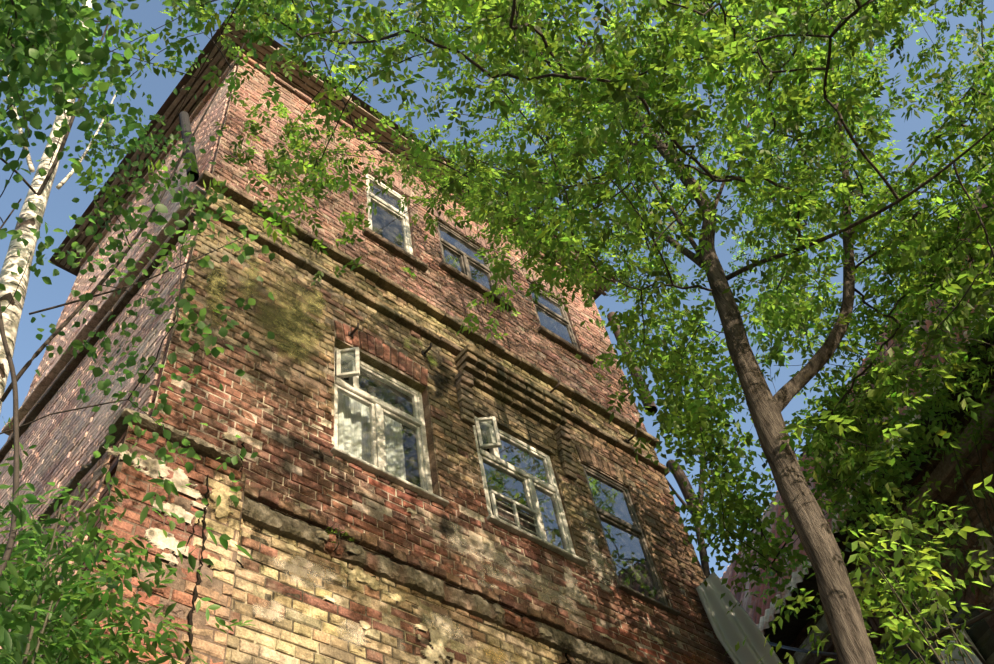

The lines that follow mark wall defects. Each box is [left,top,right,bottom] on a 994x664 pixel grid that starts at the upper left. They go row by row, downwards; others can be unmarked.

damp [260,285,325,358]
peeling [92,438,234,526]
peeling [144,527,189,566]
crack [184,475,210,664]
peeling [207,555,225,572]
spalling [266,545,472,664]